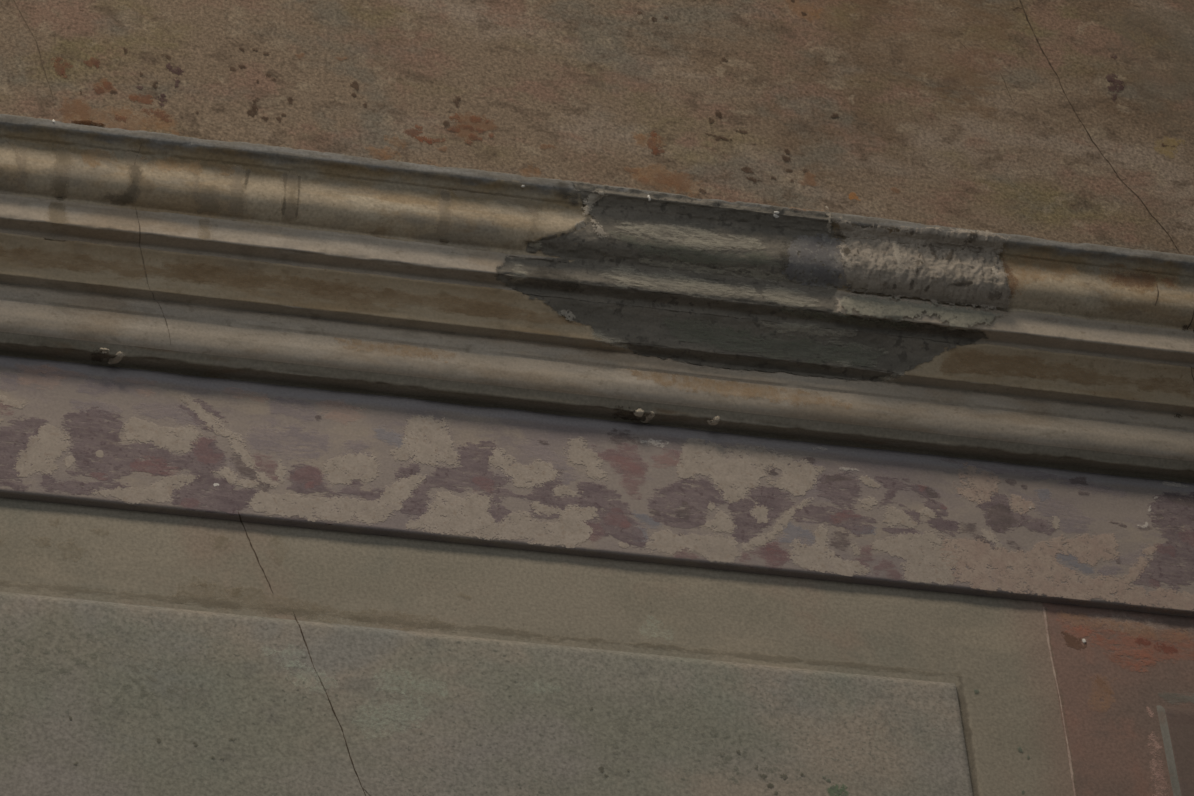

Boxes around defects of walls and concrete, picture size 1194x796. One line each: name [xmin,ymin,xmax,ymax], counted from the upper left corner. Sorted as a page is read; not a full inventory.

crack [1013,0,1179,252]
flaking render [494,181,989,382]
crack [238,512,273,592]
peeling [0,348,1194,616]
crack [293,612,371,796]